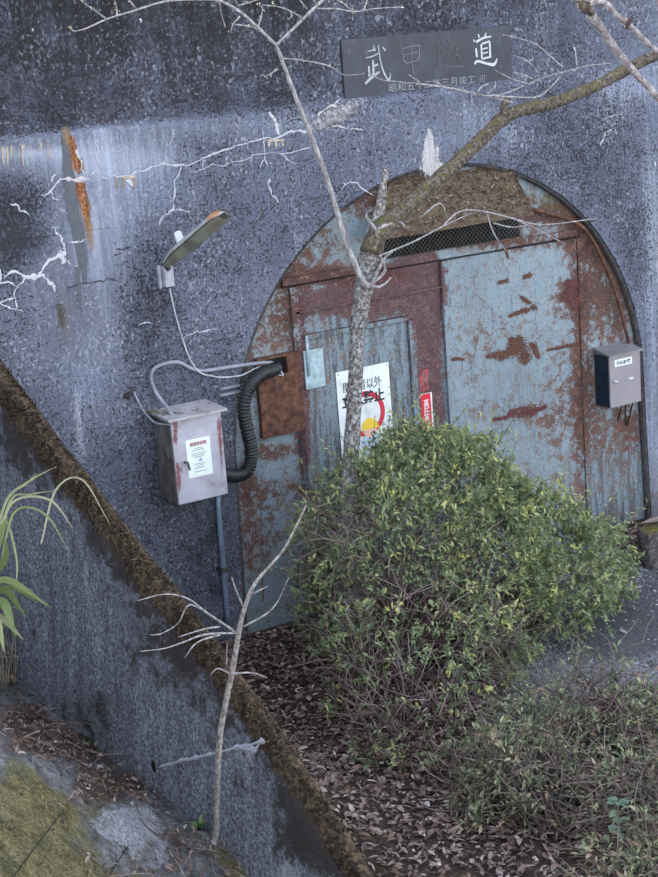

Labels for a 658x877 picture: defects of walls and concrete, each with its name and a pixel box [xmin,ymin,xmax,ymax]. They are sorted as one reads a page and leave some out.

crack [41,99,363,225]
corrosion [62,127,93,312]
crack [0,229,117,312]
corrosion [508,295,537,318]
corrosion [558,278,580,312]
corrosion [485,334,580,366]
corrosion [492,403,547,421]